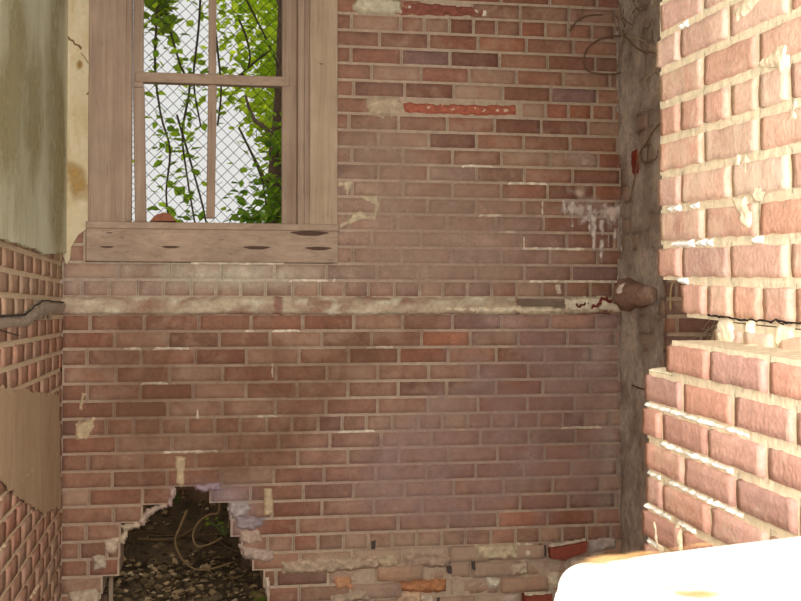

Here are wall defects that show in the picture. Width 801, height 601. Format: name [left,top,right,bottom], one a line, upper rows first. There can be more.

peeling [0,0,68,255]
water stain [562,189,622,281]
crack [707,314,801,325]
spalling [194,482,221,492]
spalling [68,589,101,601]
spalling [92,487,176,571]
spalling [227,501,274,562]
spalling [281,540,452,601]
spalling [486,577,500,589]
spalling [471,542,546,577]
spalling [547,572,561,588]
spalling [587,537,617,553]